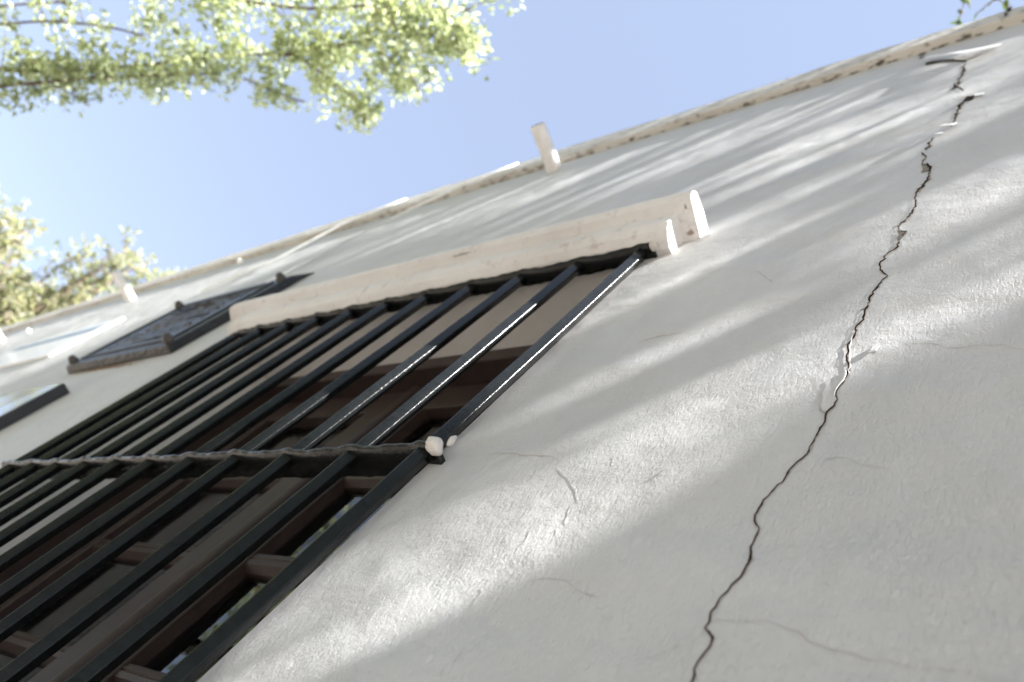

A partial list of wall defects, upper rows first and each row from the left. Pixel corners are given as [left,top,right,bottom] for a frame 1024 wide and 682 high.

crack [691,63,1012,682]